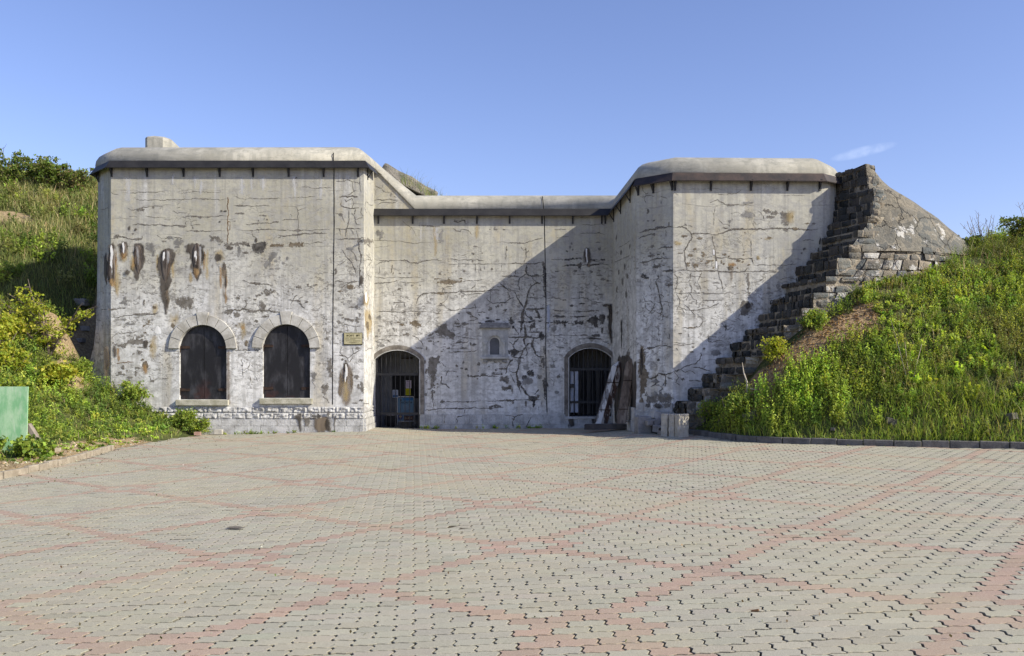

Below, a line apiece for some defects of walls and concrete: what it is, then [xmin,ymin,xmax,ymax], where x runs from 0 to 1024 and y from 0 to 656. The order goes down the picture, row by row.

crack [101,179,816,427]
spalling [375,300,606,409]
water stain [614,345,649,422]